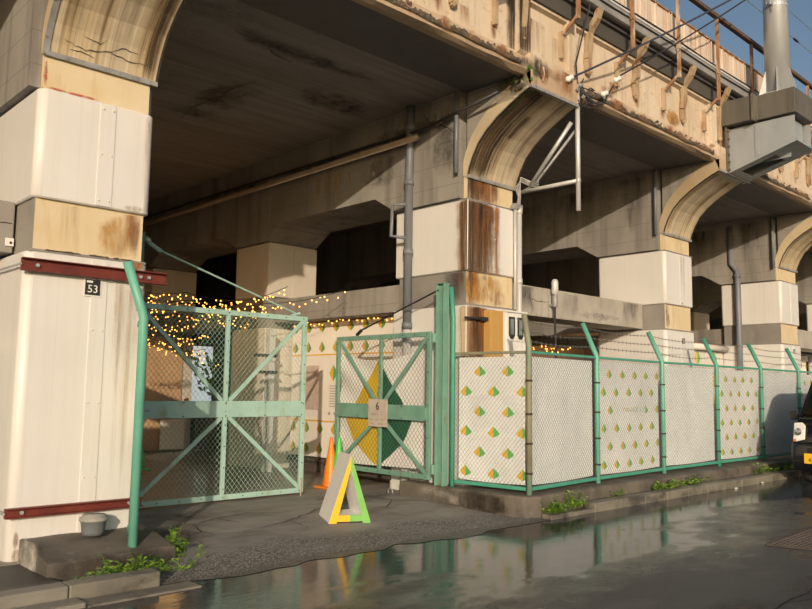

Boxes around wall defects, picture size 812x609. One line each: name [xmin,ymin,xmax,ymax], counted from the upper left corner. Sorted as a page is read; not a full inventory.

crack [65,37,143,65]
damp [141,0,176,73]
spalling [386,0,522,63]
damp [471,91,550,175]
spalling [586,91,715,154]
spalling [760,174,810,200]
rust [460,178,500,274]
rust [460,306,484,358]